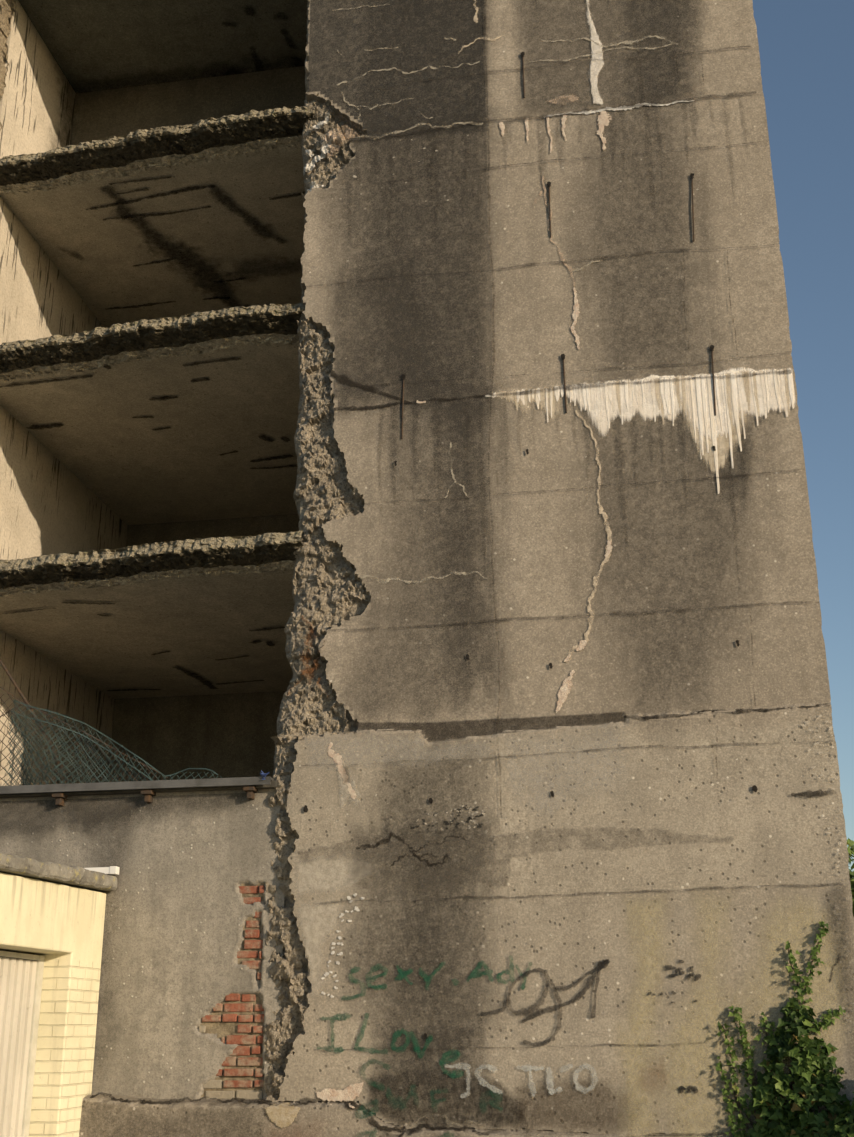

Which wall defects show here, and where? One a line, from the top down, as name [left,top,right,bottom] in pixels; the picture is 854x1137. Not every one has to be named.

crack [323,4,504,135]
leakage [75,0,486,711]
leakage [485,0,796,686]
spalling [0,0,371,1128]
crack [361,571,484,583]
crack [556,410,612,713]
crack [356,805,485,867]
crack [90,1093,489,1137]